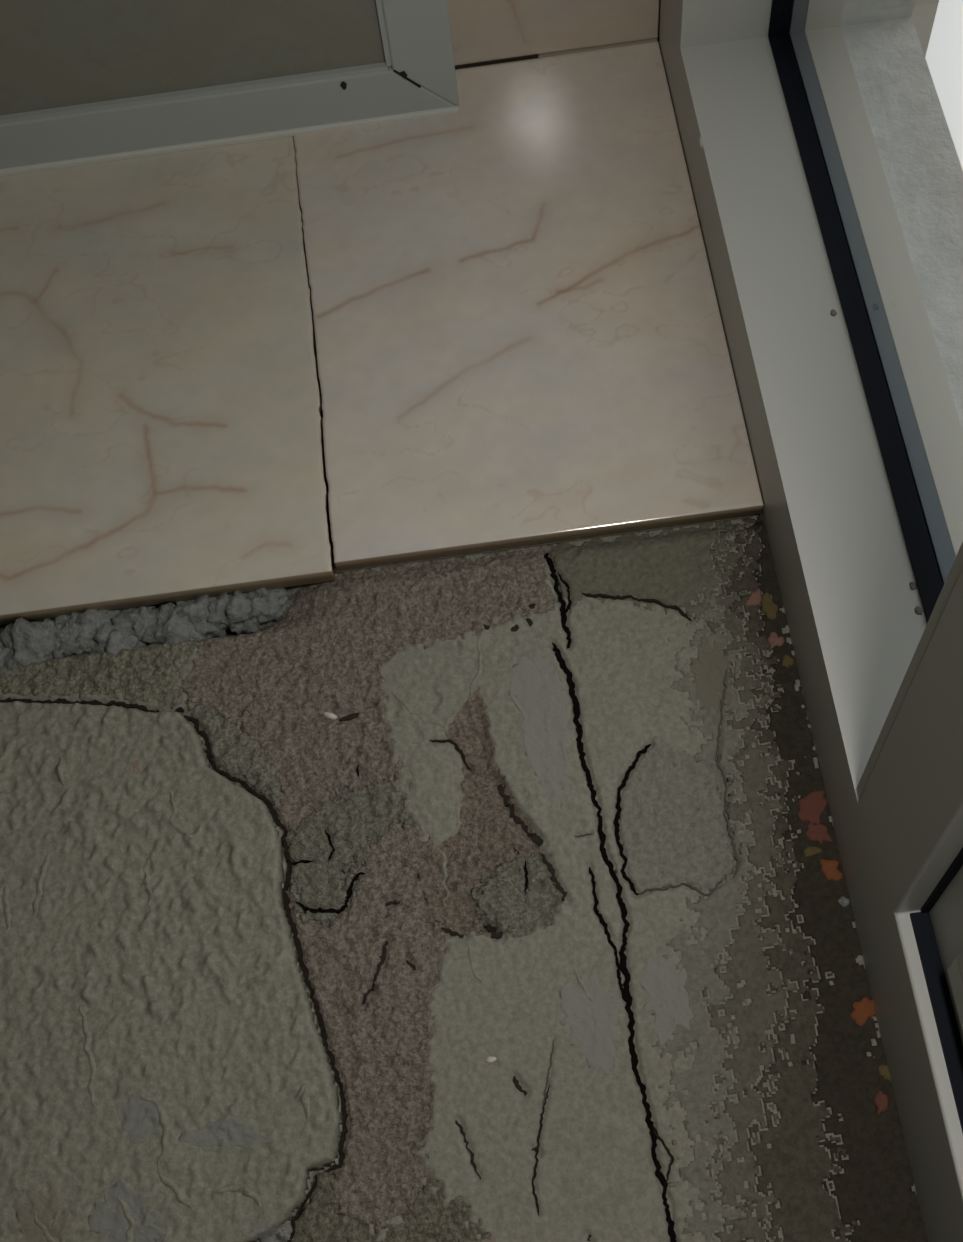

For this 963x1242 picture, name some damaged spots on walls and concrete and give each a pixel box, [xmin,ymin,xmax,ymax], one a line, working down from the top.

spalling [182,544,568,1242]
crack [532,1039,555,1214]
crack [544,553,741,1242]
spalling [614,736,734,896]